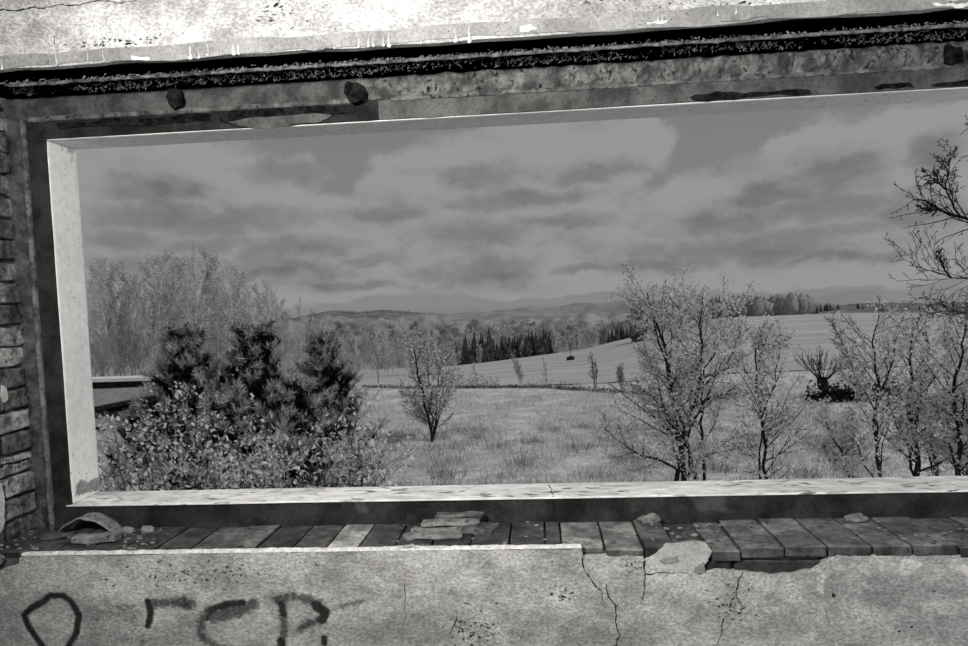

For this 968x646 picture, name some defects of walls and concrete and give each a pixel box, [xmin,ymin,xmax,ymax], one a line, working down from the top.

crack [0,0,137,11]
crack [642,560,688,600]
peeling [659,556,680,565]
crack [582,557,621,646]
crack [716,572,743,646]